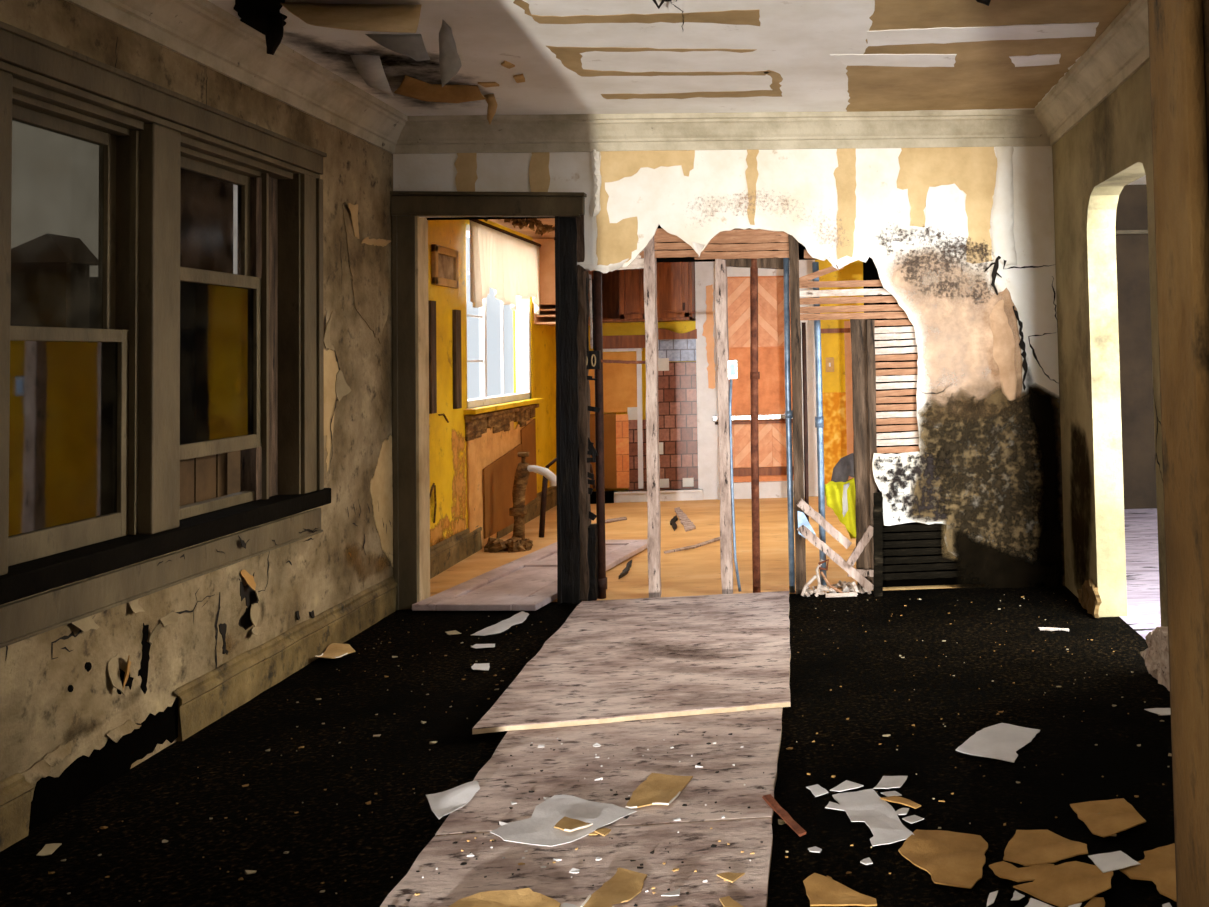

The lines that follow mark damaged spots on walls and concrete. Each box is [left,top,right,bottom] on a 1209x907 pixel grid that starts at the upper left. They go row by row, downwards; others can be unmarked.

flaking render [513,0,760,26]
flaking render [546,46,783,100]
flaking render [846,0,1131,112]
flaking render [579,150,695,273]
flaking render [825,148,856,269]
flaking render [897,147,997,264]
crack [985,256,1058,391]
leakage [874,226,1091,588]
peeling [370,435,393,567]
crack [51,617,94,659]
crack [161,589,221,668]
spalling [21,698,178,831]